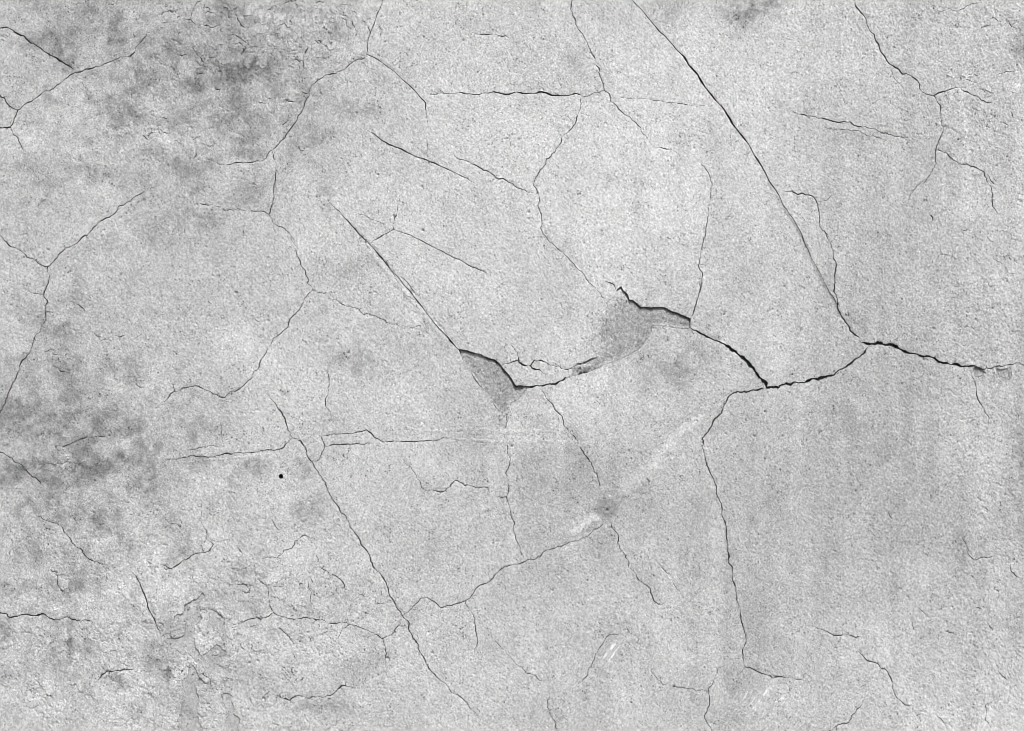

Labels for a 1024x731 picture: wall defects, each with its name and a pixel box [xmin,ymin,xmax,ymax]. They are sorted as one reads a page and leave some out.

crack [0,0,646,413]
flaking render [570,286,691,376]
crack [628,0,1024,681]
flaking render [458,349,530,413]
crack [0,414,105,487]
crack [38,516,103,565]
crack [151,345,681,729]
crack [0,612,90,622]
crack [132,572,161,634]
crack [652,663,727,730]
crack [815,627,911,706]